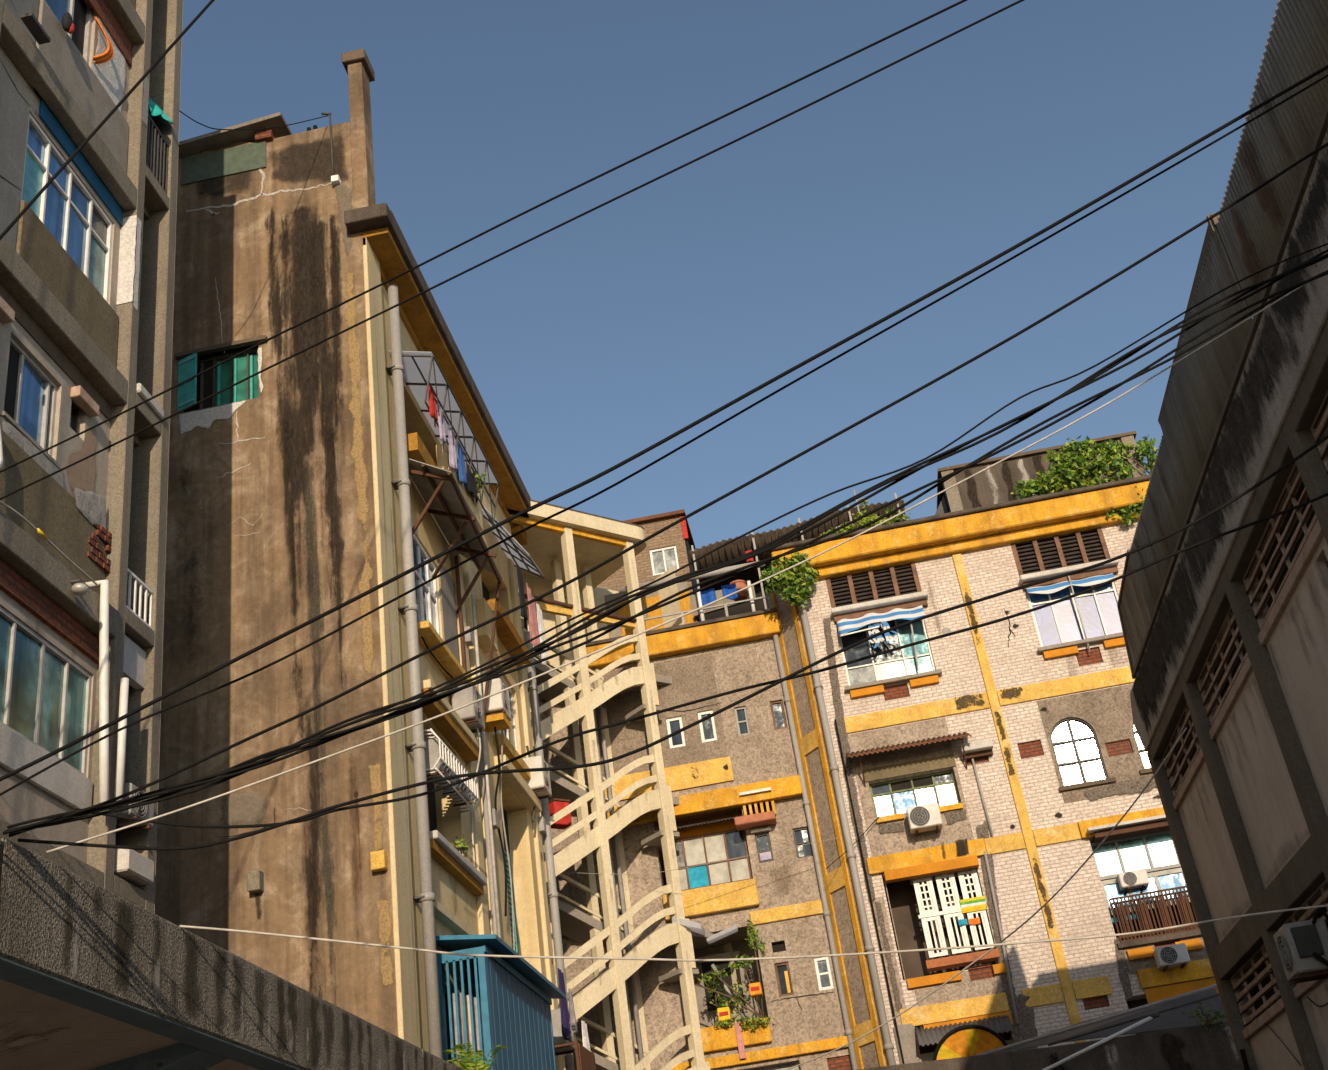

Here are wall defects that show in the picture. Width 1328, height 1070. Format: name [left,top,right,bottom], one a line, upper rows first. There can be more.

crack [186,168,332,216]
flaking render [179,401,245,434]
water stain [1132,130,1328,738]
spalling [67,429,112,573]
water stain [214,206,458,1070]
water stain [63,912,78,976]
water stain [94,890,132,988]
water stain [153,918,198,1016]